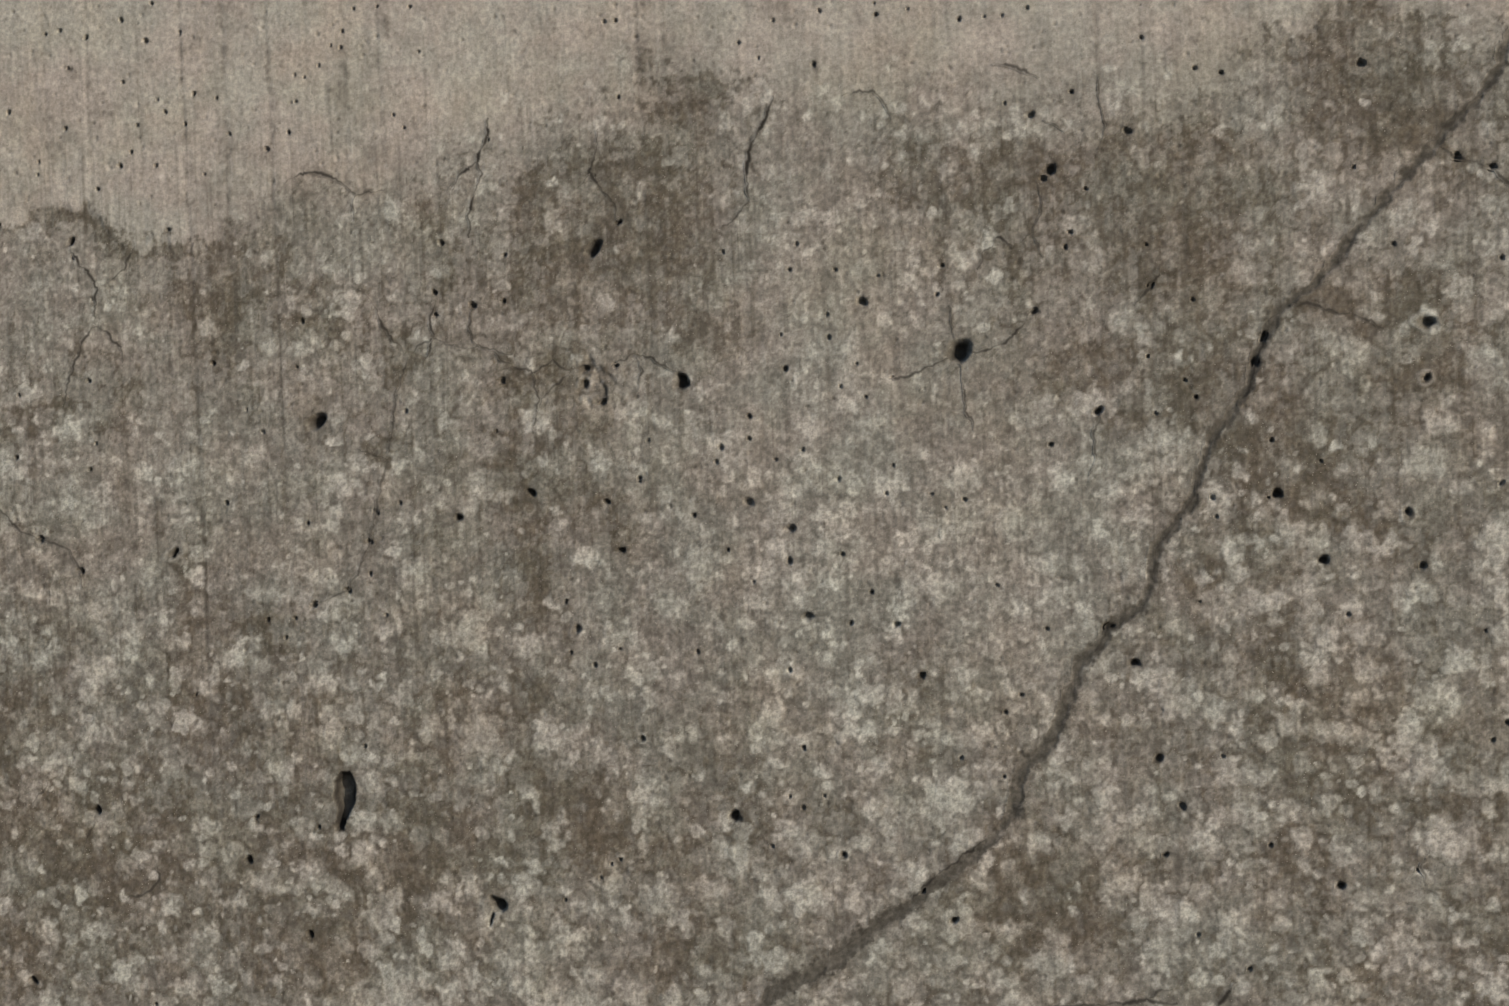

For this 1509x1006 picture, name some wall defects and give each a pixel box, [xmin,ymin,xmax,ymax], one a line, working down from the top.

damp [0,55,868,1006]
crack [722,95,775,227]
crack [756,26,1509,1006]
damp [849,0,1509,844]
damp [1253,830,1364,906]